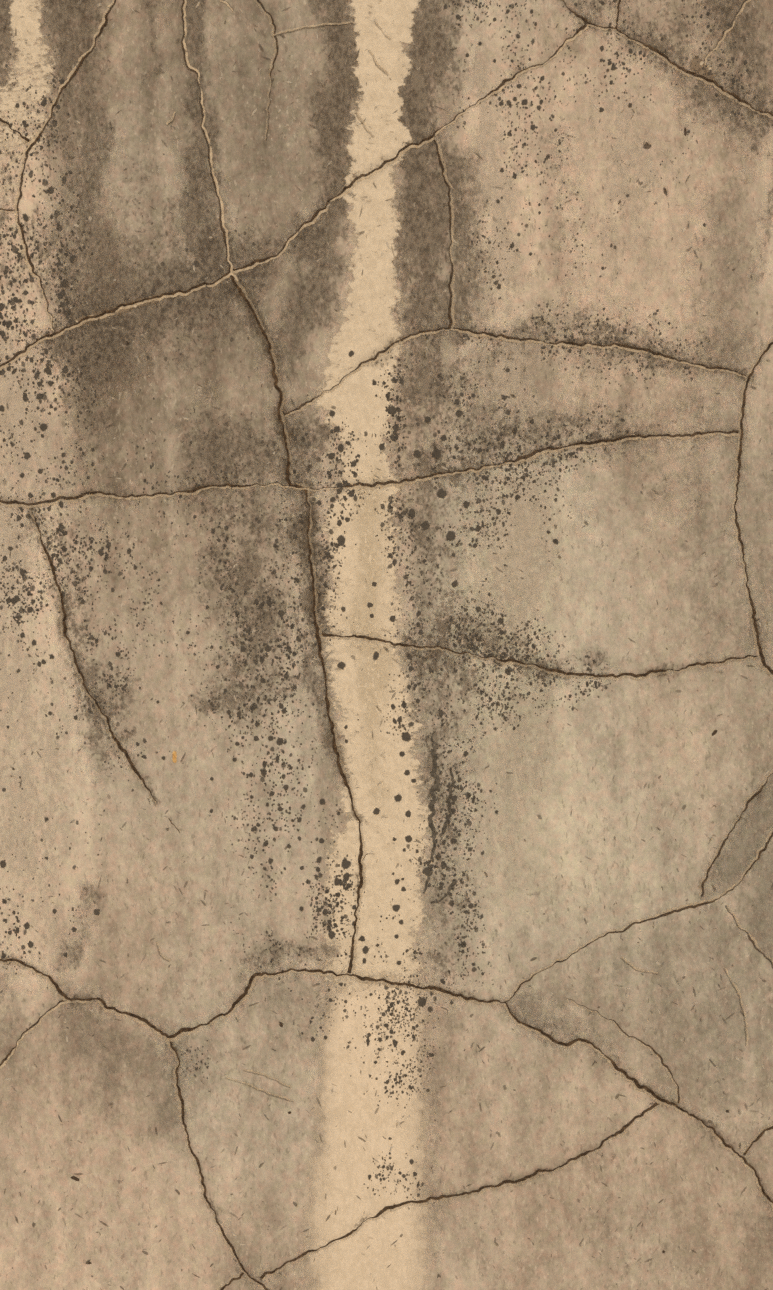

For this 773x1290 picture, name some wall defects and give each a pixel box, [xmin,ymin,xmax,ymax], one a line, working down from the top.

damp [542,0,773,154]
damp [36,434,104,513]
crack [0,0,773,974]
damp [0,883,104,974]
crack [0,832,773,1290]